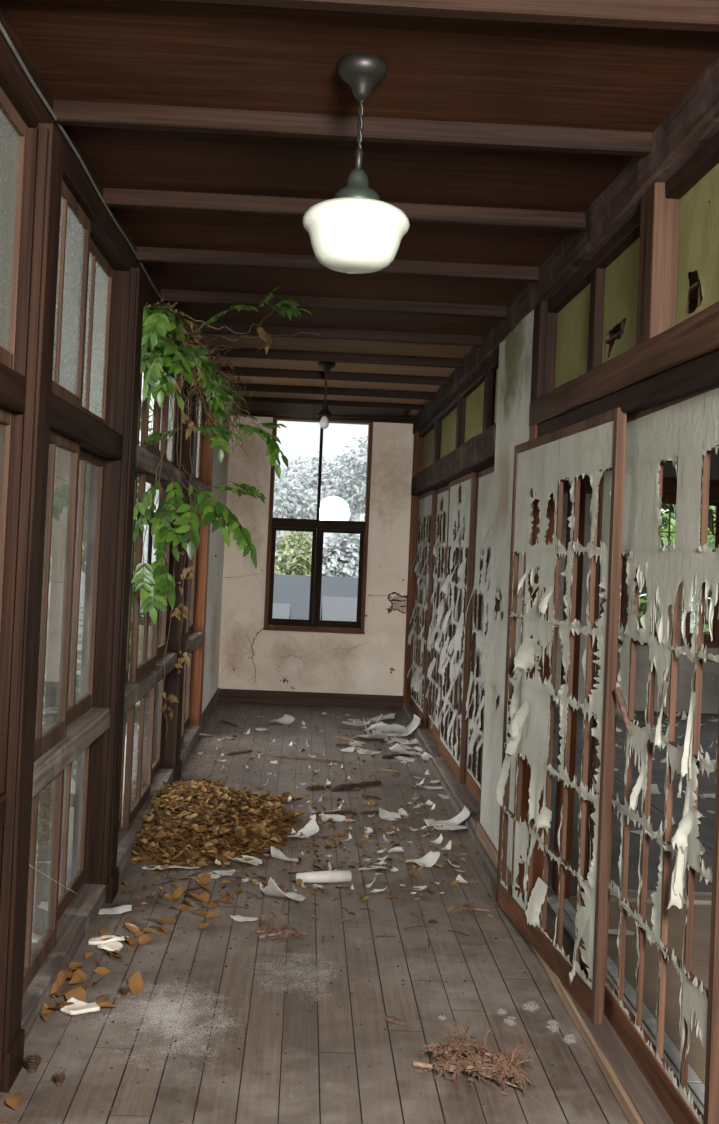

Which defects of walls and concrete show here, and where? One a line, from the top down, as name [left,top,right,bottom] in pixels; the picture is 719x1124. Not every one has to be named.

flaking render [386,579,407,615]
crack [222,629,263,683]